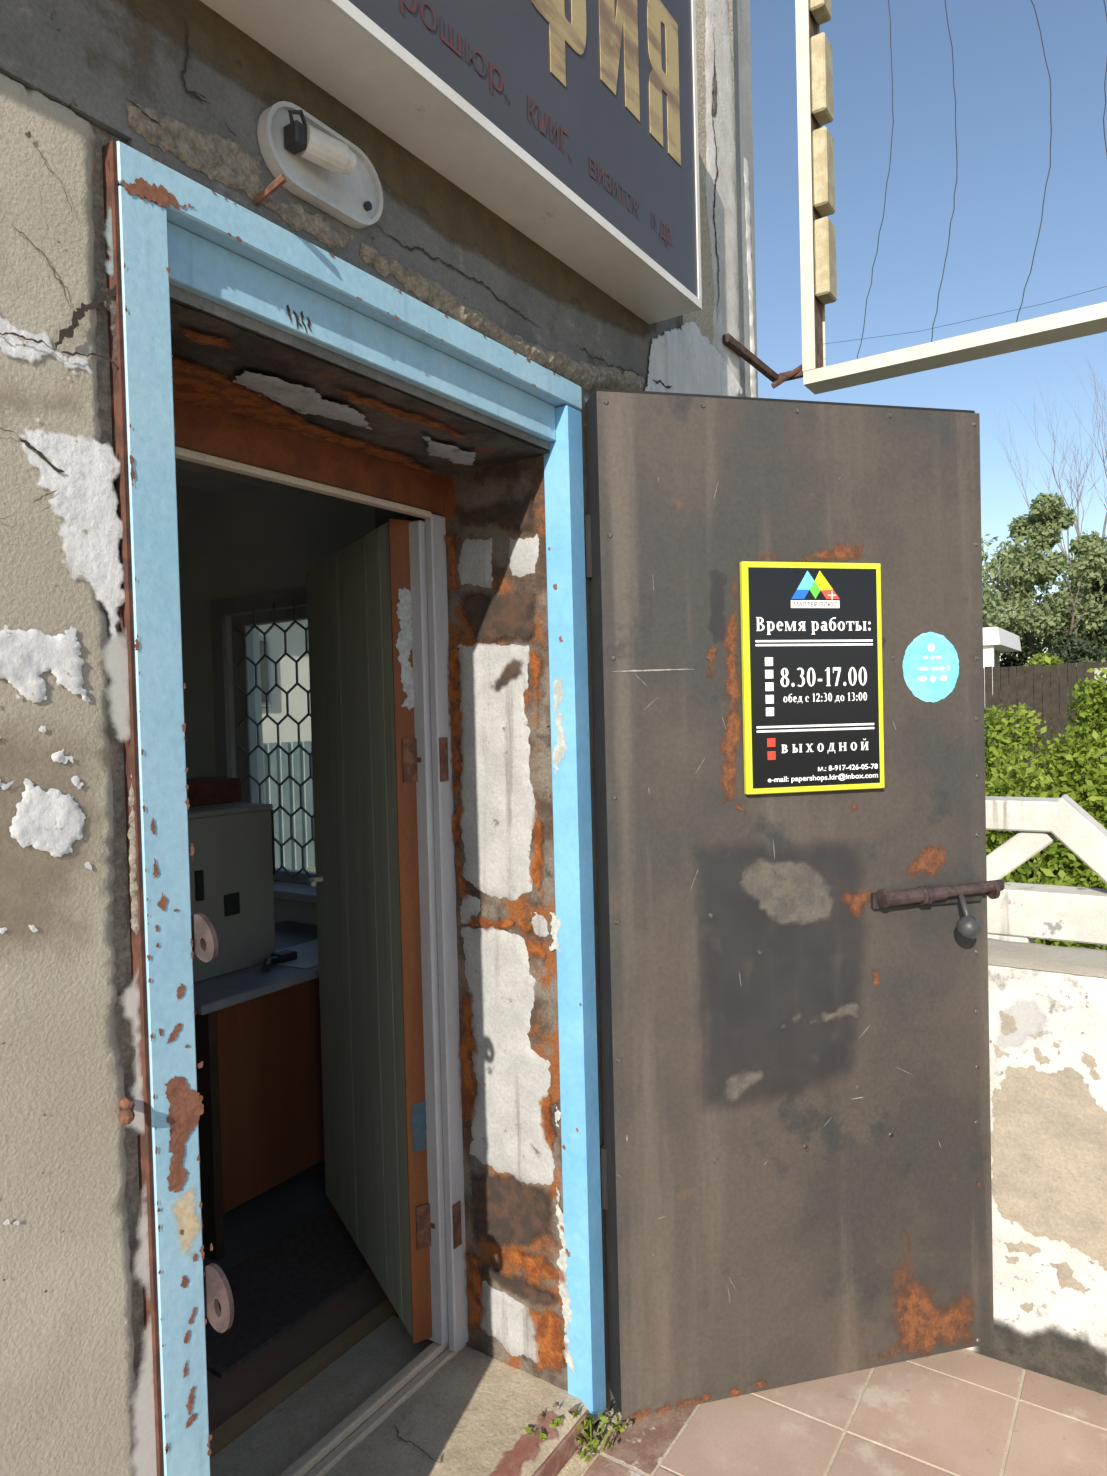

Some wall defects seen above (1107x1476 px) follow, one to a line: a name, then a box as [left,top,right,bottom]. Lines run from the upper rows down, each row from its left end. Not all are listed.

spalling [232,371,373,430]
crack [0,427,65,519]
peeling [0,624,92,703]
rust [707,614,744,811]
peeling [0,749,92,870]
rust [908,846,945,875]
rust [165,1076,204,1253]
peeling [991,1010,1107,1295]
peeling [556,1188,577,1377]
rust [891,1265,972,1353]
crack [394,1423,442,1463]
peeling [489,1411,562,1476]